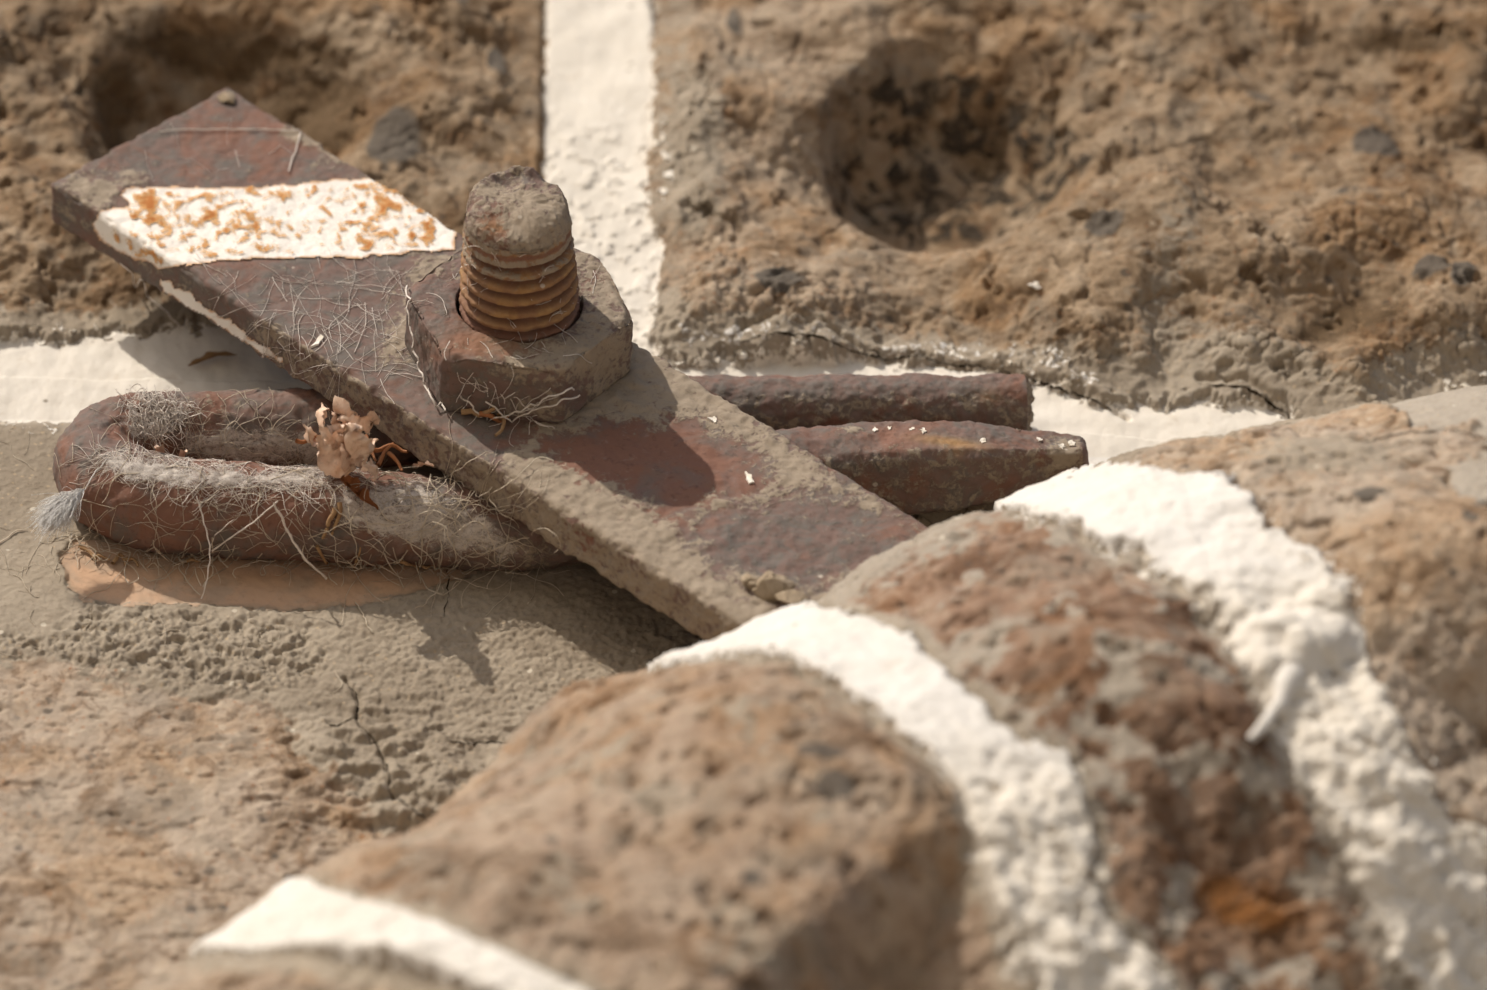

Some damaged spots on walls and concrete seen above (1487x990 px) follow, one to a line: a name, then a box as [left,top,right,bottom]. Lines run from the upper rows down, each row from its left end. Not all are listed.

corrosion [113,182,436,265]
crack [327,679,428,821]